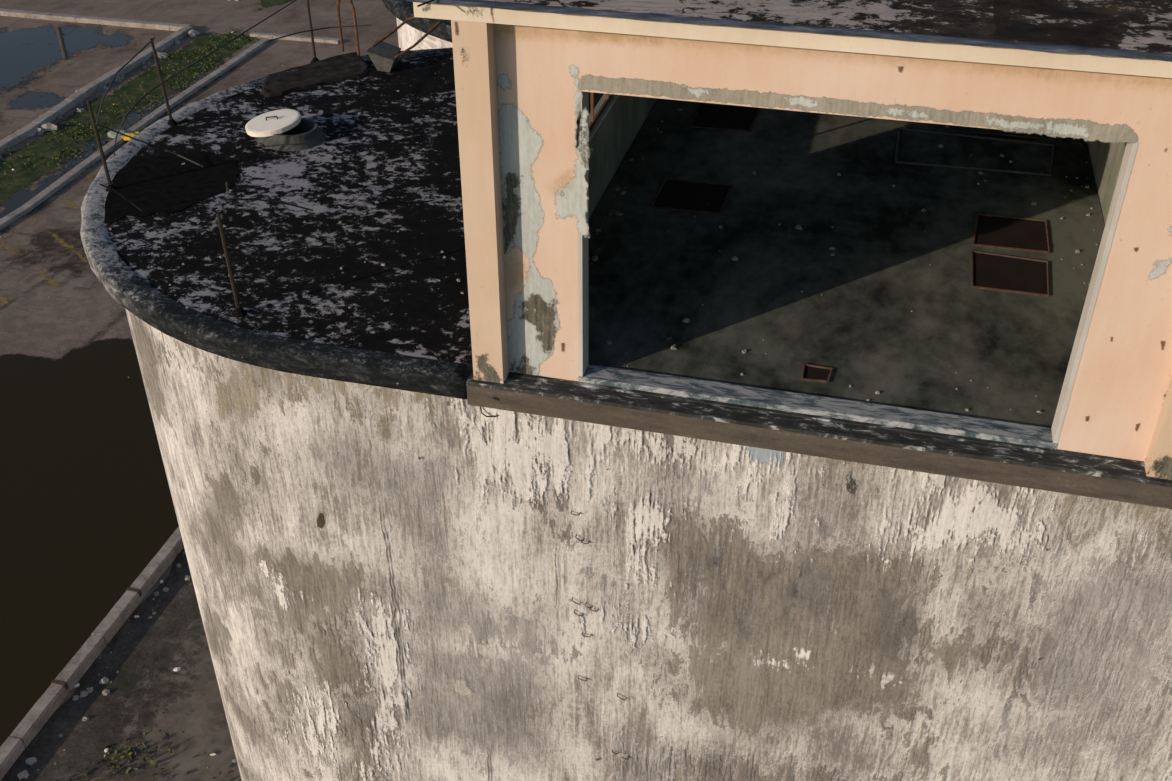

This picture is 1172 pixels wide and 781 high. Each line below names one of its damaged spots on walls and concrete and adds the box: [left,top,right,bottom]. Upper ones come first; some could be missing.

peeling [497,65,1138,376]
peeling [1148,258,1172,280]
crack [379,502,408,722]